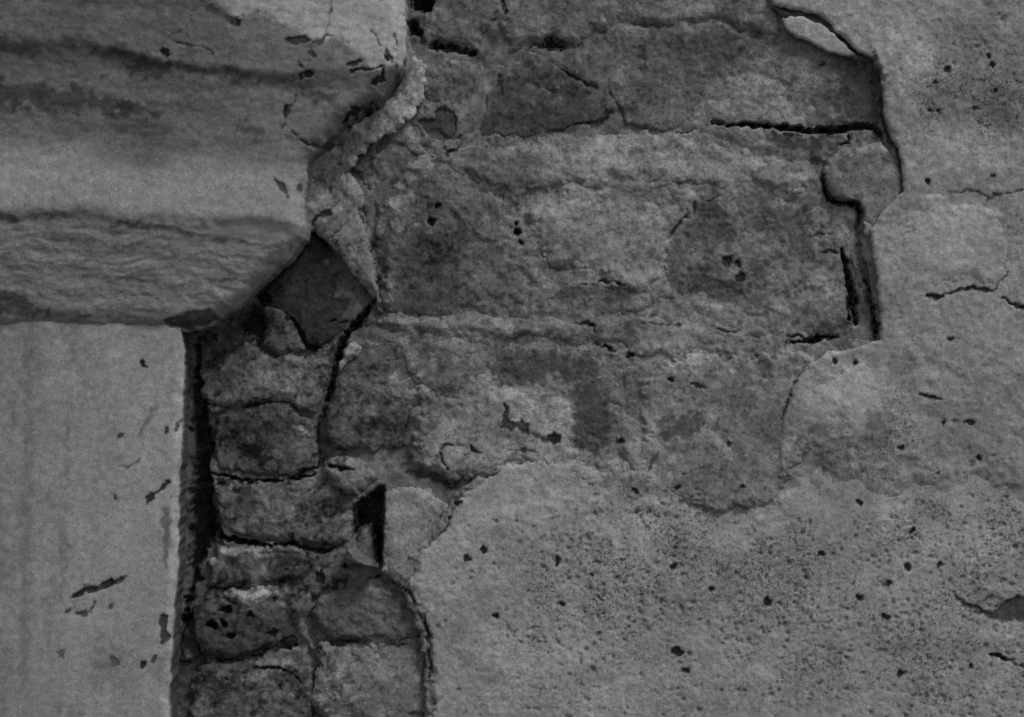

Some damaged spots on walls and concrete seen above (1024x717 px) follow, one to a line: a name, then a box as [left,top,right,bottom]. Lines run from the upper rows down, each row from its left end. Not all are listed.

peeling [285,33,331,45]
spalling [406,0,476,56]
crack [281,29,400,151]
spalling [766,0,900,170]
spalling [417,106,457,142]
crack [676,122,882,144]
crack [926,272,1024,309]
spalling [164,312,220,330]
spalling [500,403,561,444]
spalling [399,475,485,717]
spalling [261,629,298,653]
spalling [671,646,690,673]